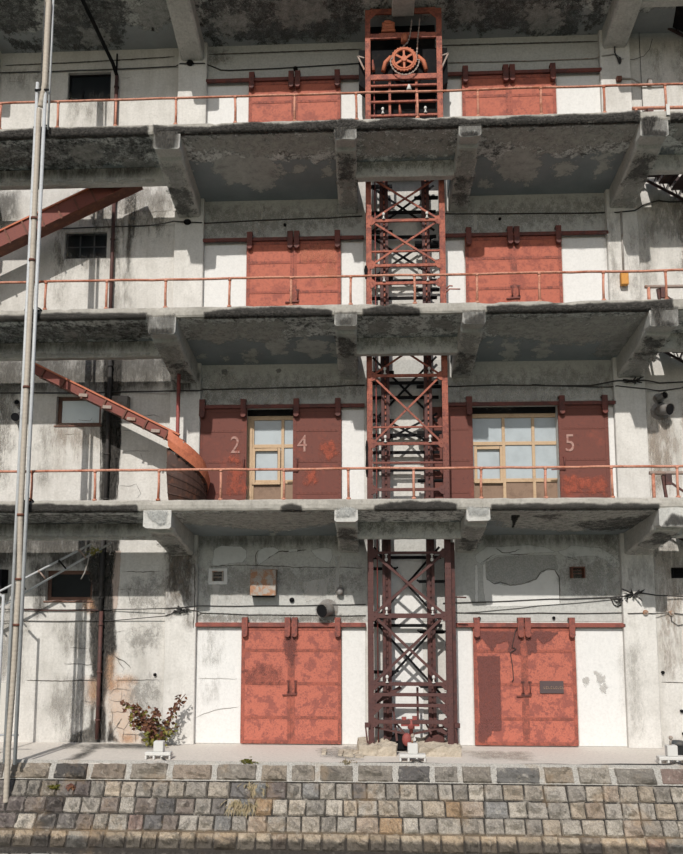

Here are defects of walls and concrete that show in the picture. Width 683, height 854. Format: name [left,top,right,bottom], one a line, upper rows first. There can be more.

damp [0,110,683,158]
damp [0,167,199,419]
damp [184,304,420,345]
damp [0,409,152,760]
damp [168,554,192,606]
damp [181,503,335,544]
crack [193,550,354,628]
peeling [458,527,620,607]
spalling [577,515,650,532]
spalling [630,533,679,555]
rust [110,677,132,740]